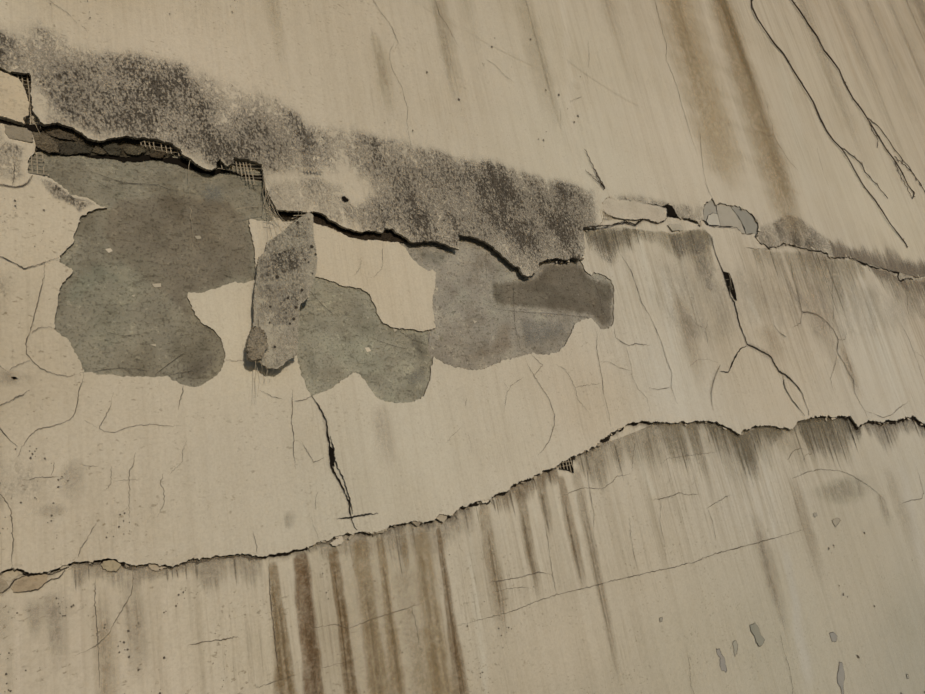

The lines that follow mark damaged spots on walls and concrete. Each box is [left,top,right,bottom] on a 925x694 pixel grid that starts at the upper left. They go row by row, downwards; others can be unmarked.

spalling [17,74,274,387]
damp [0,29,710,278]
spalling [284,236,613,403]
peeling [703,200,758,235]
damp [759,216,925,301]
crack [0,196,925,688]
damp [645,422,781,465]
damp [798,416,896,457]
rust [295,556,322,694]
rust [331,552,357,694]
peeling [716,640,738,673]
peeling [750,623,765,647]